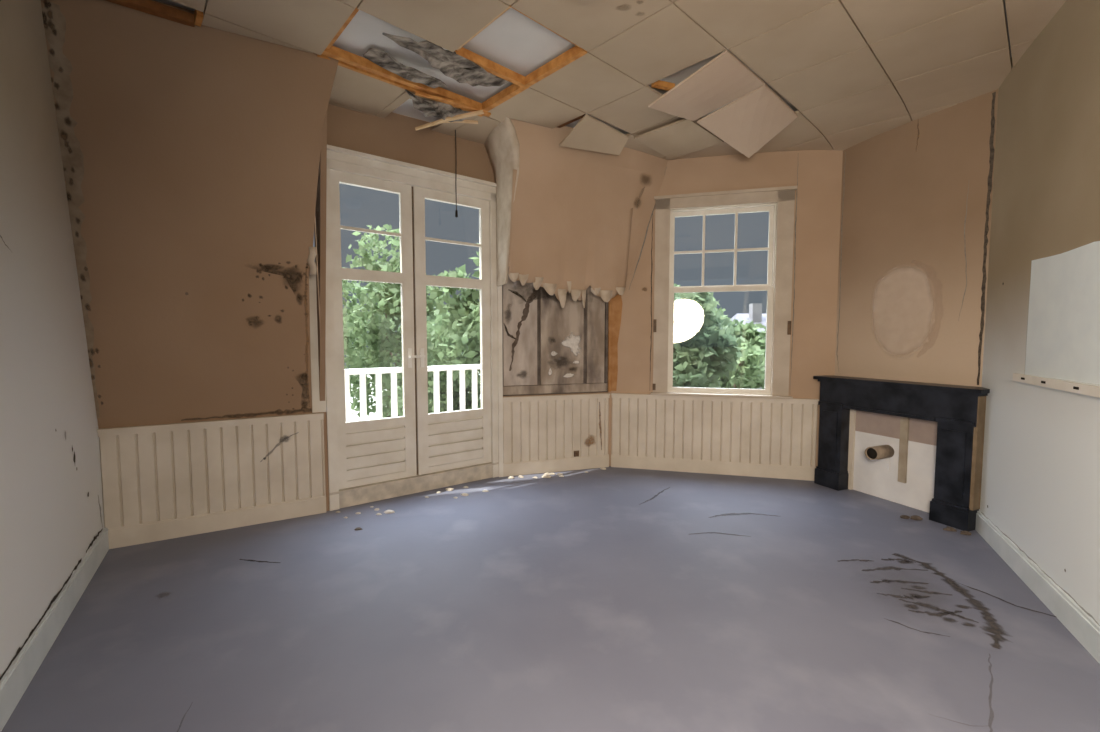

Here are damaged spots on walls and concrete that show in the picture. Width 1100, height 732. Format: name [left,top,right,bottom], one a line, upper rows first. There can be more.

leakage [256,262,310,407]
crack [504,288,537,371]
leakage [838,553,1006,649]